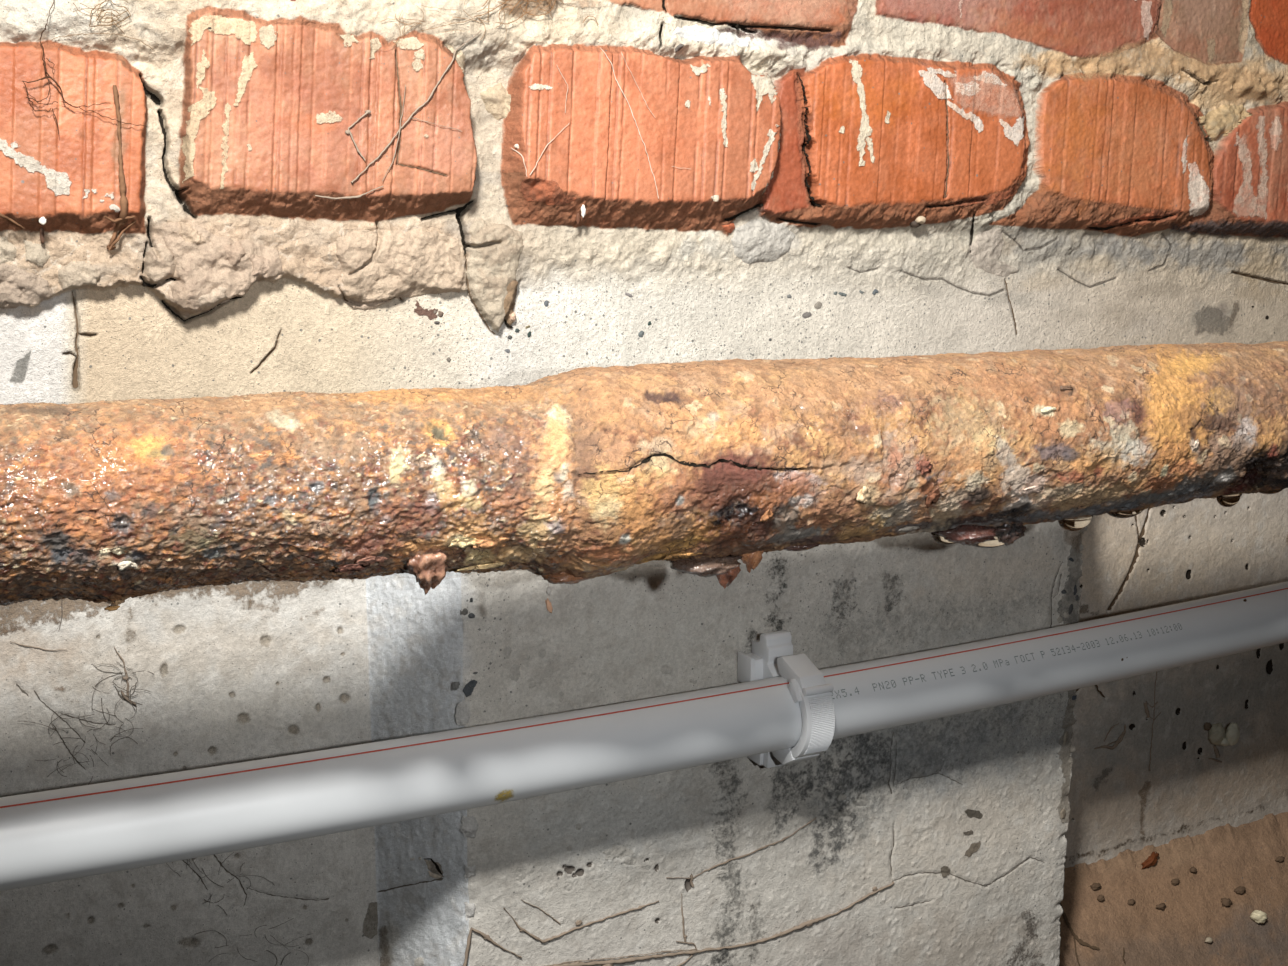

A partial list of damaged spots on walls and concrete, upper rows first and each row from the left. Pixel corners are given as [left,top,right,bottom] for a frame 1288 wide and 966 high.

crack [139,75,194,217]
spalling [520,178,576,205]
crack [724,74,822,225]
crack [140,219,243,322]
spalling [414,300,444,324]
crack [421,201,495,334]
spalling [802,289,879,319]
water stain [766,553,791,631]
water stain [711,760,759,963]
water stain [771,734,889,873]